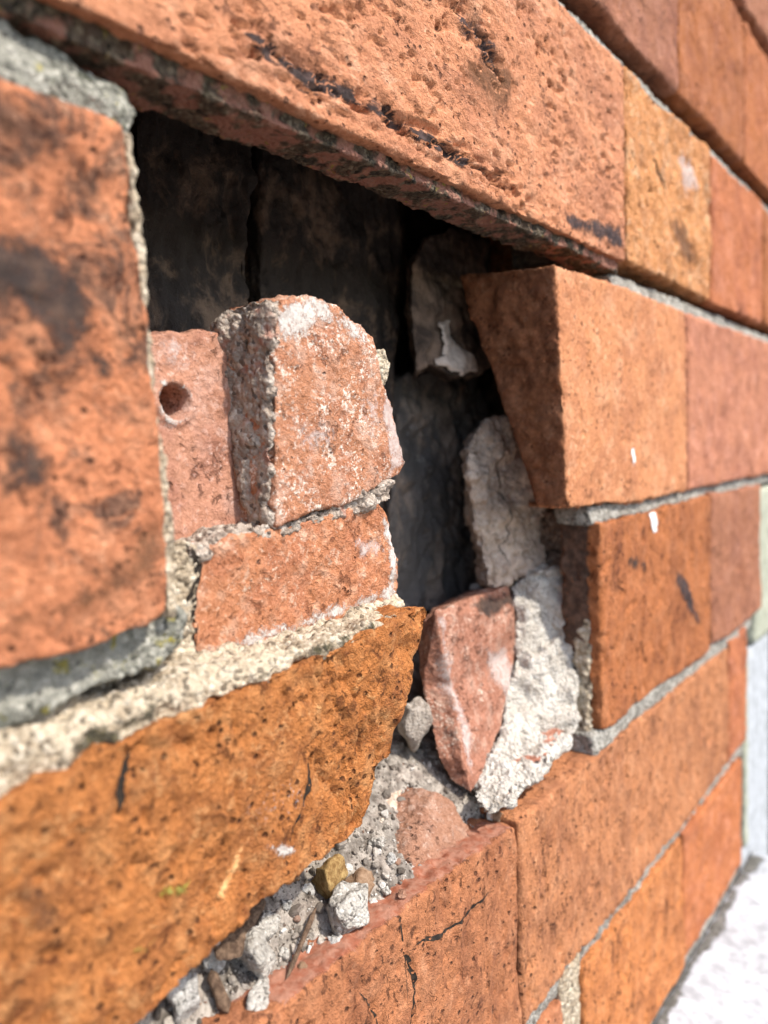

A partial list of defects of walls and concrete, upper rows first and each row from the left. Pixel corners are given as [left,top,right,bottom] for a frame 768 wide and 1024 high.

spalling [210,294,405,529]
peeling [434,320,478,376]
spalling [514,728,565,762]
spalling [0,604,427,1024]
crack [359,992,378,1024]
spalling [268,787,510,1005]
crack [395,892,489,1024]